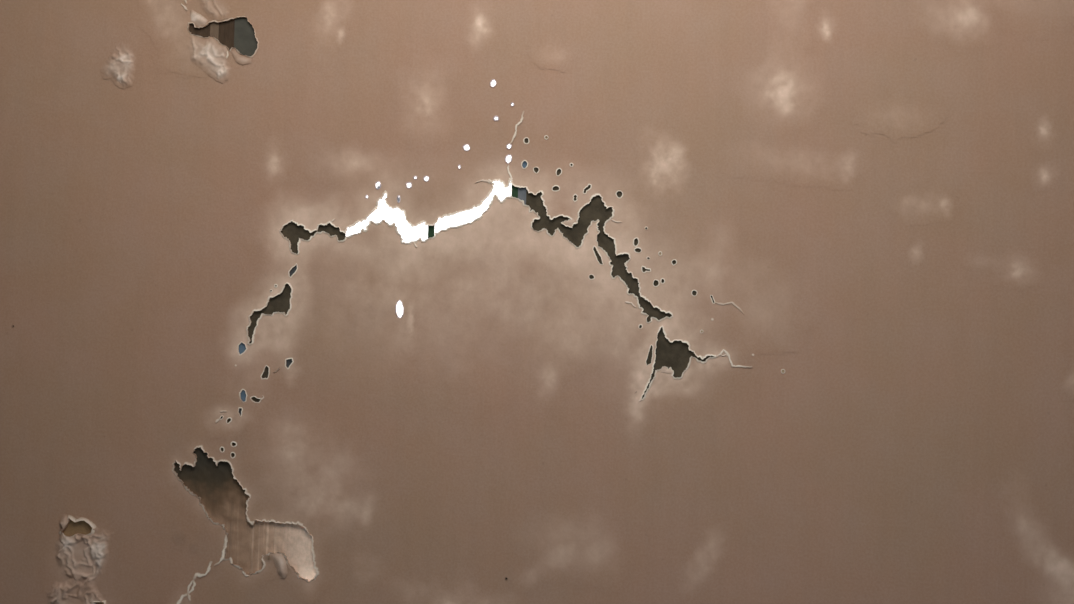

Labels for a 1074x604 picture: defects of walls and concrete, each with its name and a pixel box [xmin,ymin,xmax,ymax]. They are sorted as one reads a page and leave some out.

peeling [186,0,252,83]
spalling [235,265,297,367]
leakage [157,0,960,604]
spalling [634,227,664,286]
spalling [221,390,260,423]
peeling [45,513,116,604]